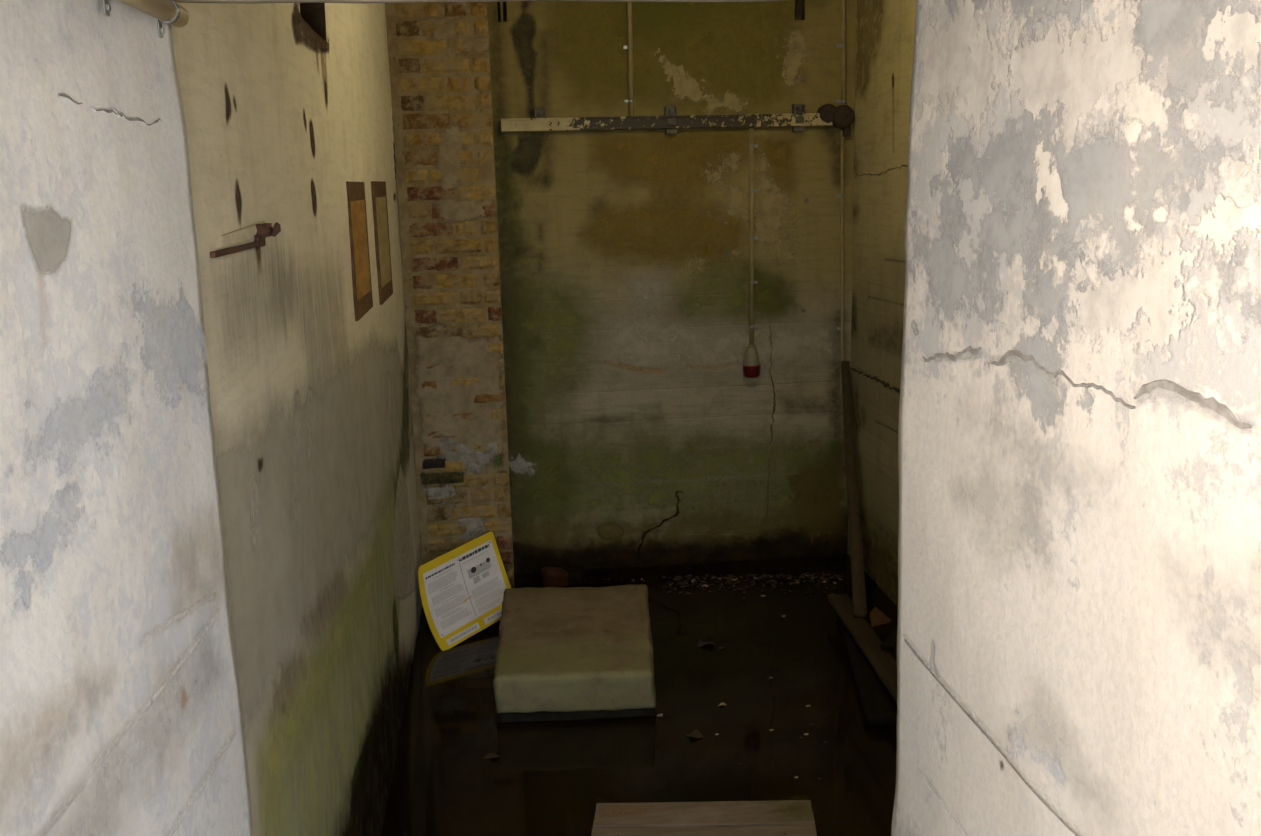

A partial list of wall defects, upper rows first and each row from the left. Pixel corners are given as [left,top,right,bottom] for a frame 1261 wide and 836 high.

crack [58,92,162,126]
water stain [512,1,537,117]
water stain [559,0,795,106]
peeling [649,48,749,115]
peeling [774,28,815,88]
crack [853,164,908,178]
peeling [909,0,1261,433]
water stain [499,126,898,607]
crack [922,346,1252,429]
crack [636,325,776,567]
water stain [341,640,416,836]